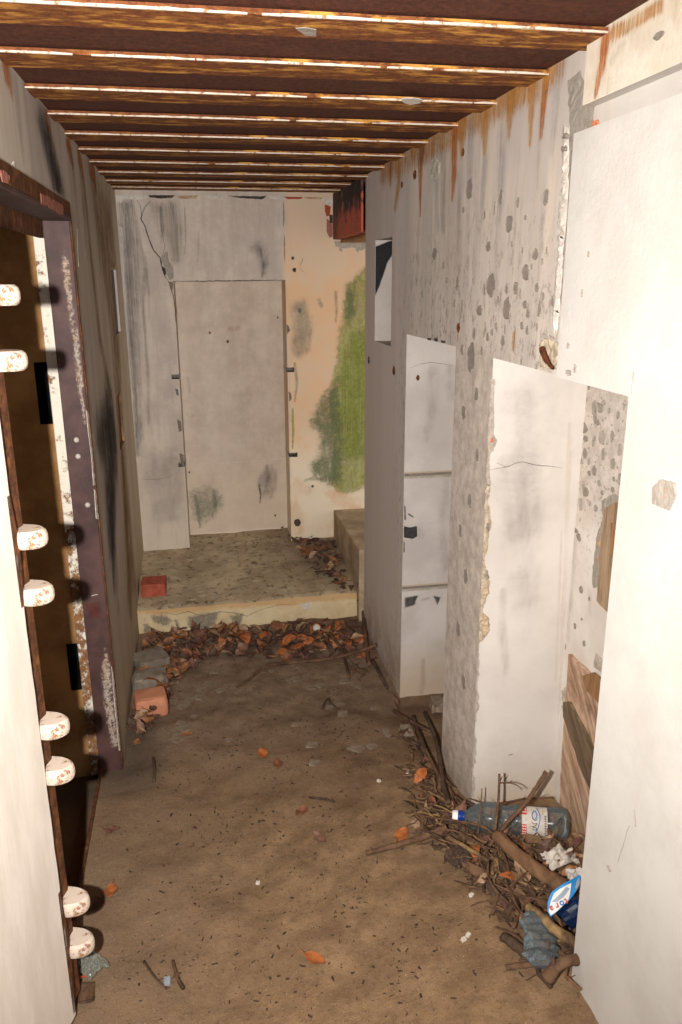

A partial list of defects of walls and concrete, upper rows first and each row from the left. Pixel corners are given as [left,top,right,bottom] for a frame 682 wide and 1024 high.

corrosion [594,0,662,98]
corrosion [66,140,97,193]
crack [137,200,176,322]
corrosion [382,59,564,217]
flaking render [431,70,600,376]
flaking render [578,386,626,601]
flaking render [652,479,677,511]
spalling [461,379,498,797]
flaking render [582,640,603,673]